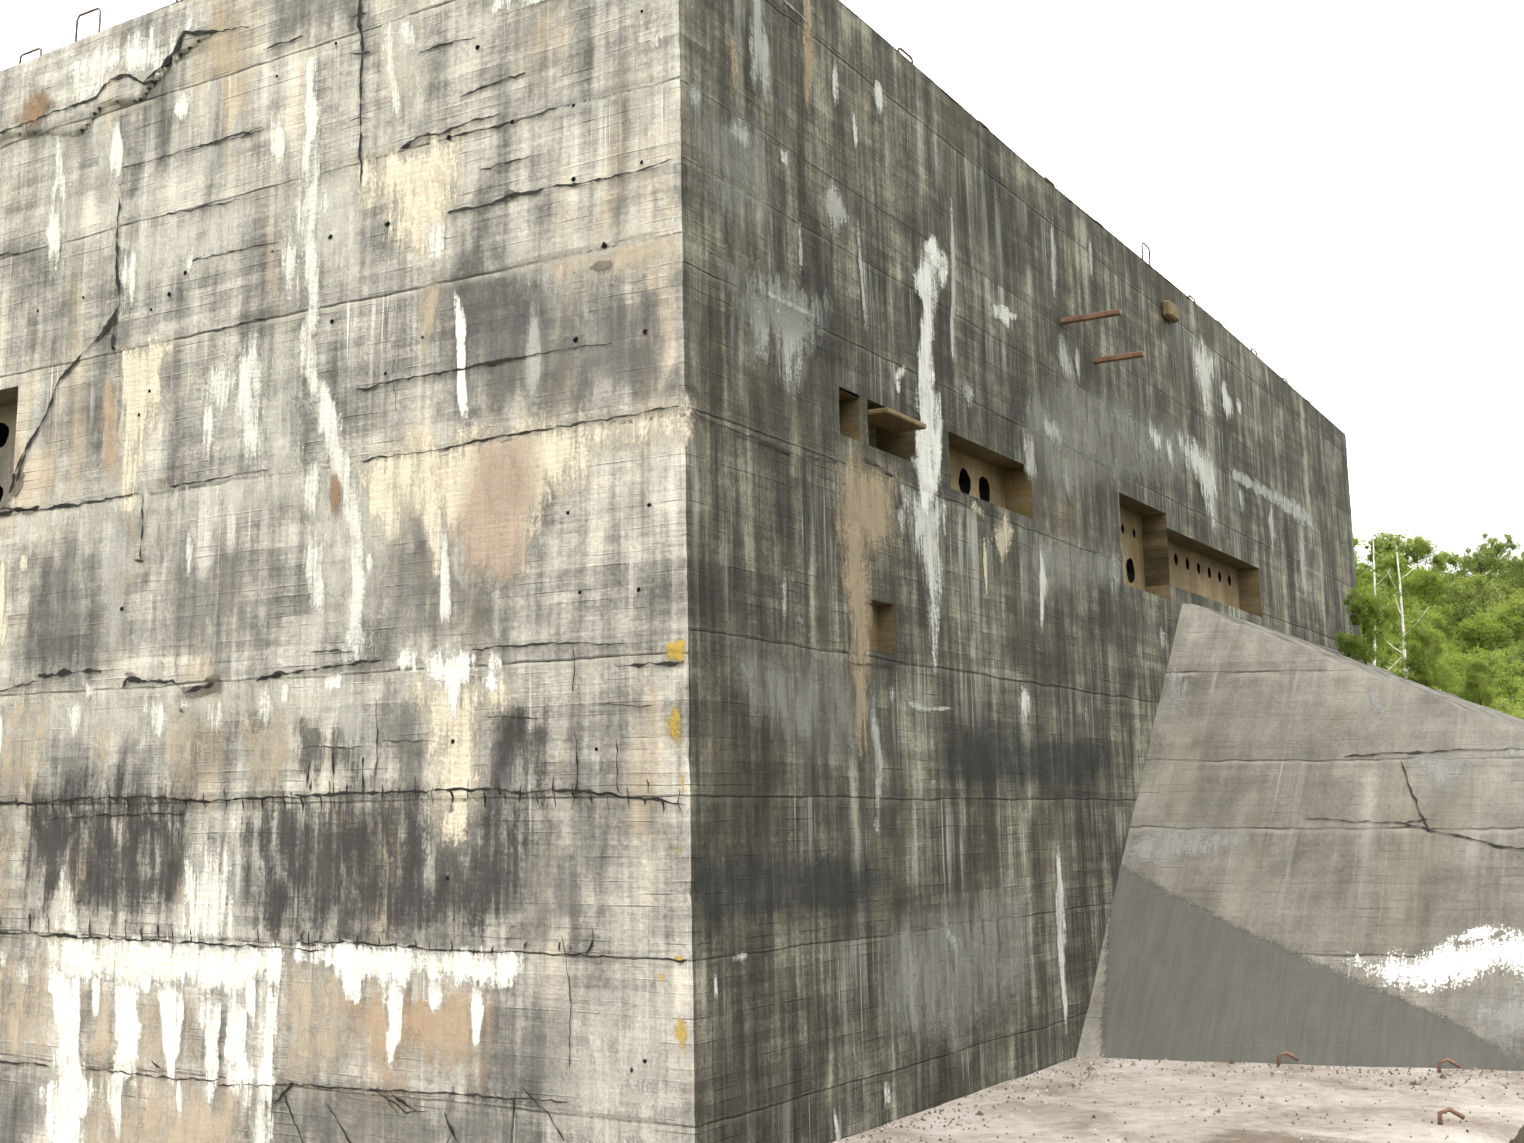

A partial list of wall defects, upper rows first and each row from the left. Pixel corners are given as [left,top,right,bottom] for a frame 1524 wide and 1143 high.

damp [63,13,209,110]
crack [0,26,303,134]
crack [350,0,371,185]
damp [381,19,425,118]
crack [420,37,476,53]
crack [401,72,671,214]
crack [0,127,279,563]
damp [0,52,691,847]
damp [893,201,956,666]
crack [1306,747,1524,849]
damp [0,814,578,1143]
damp [1099,828,1524,1071]